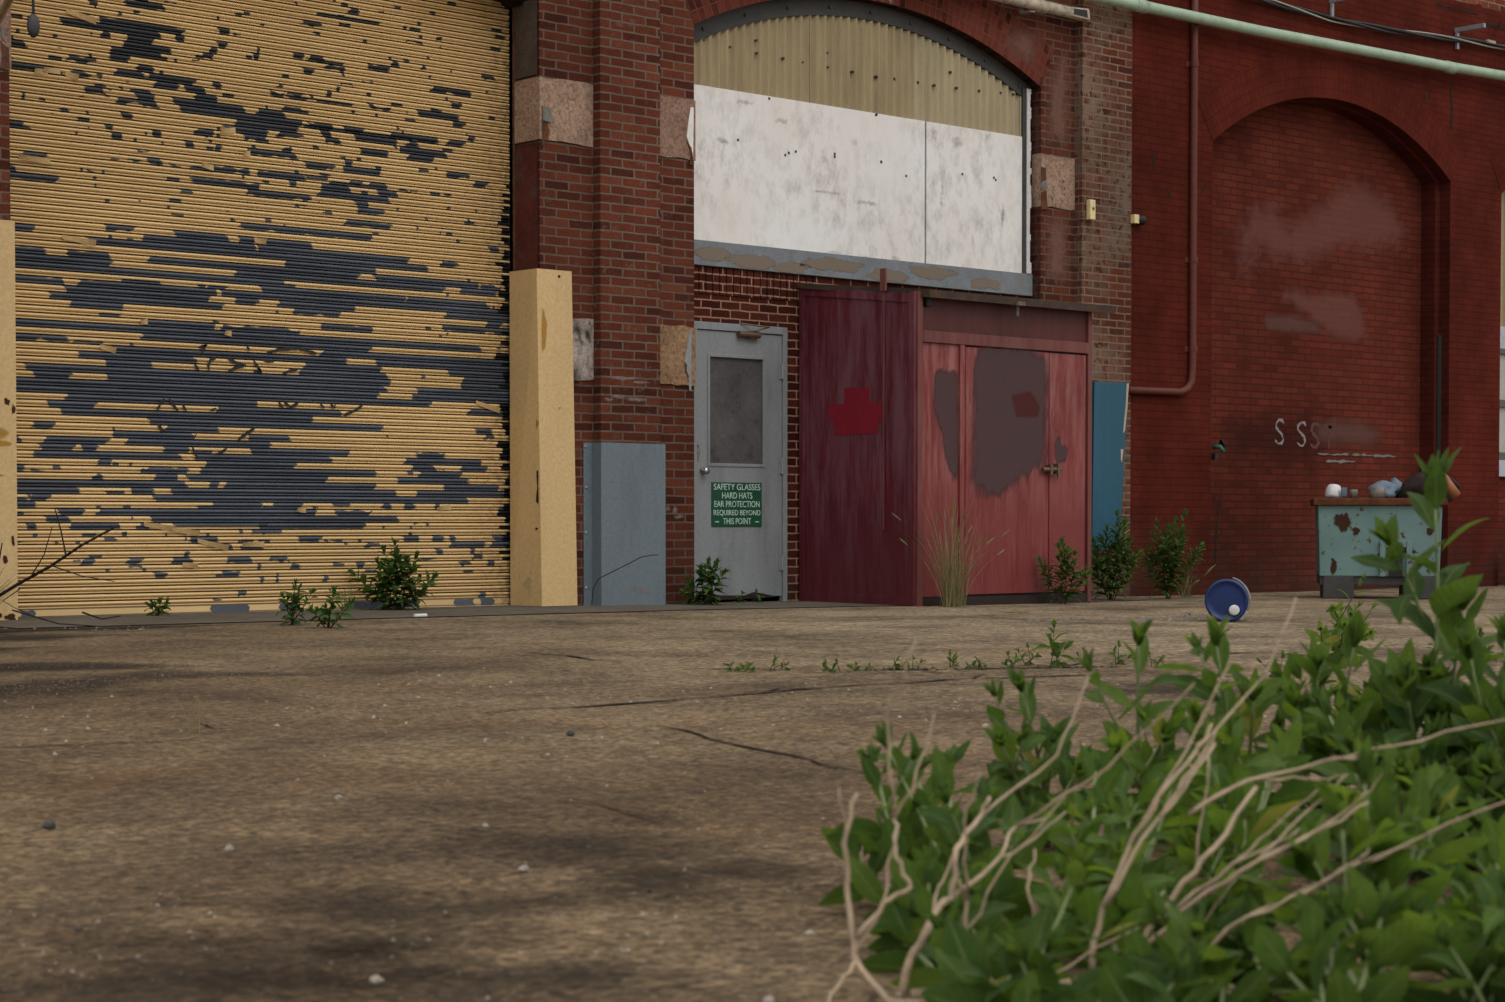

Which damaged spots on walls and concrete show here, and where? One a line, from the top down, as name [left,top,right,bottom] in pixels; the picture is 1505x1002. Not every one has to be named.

peeling [0,0,510,612]